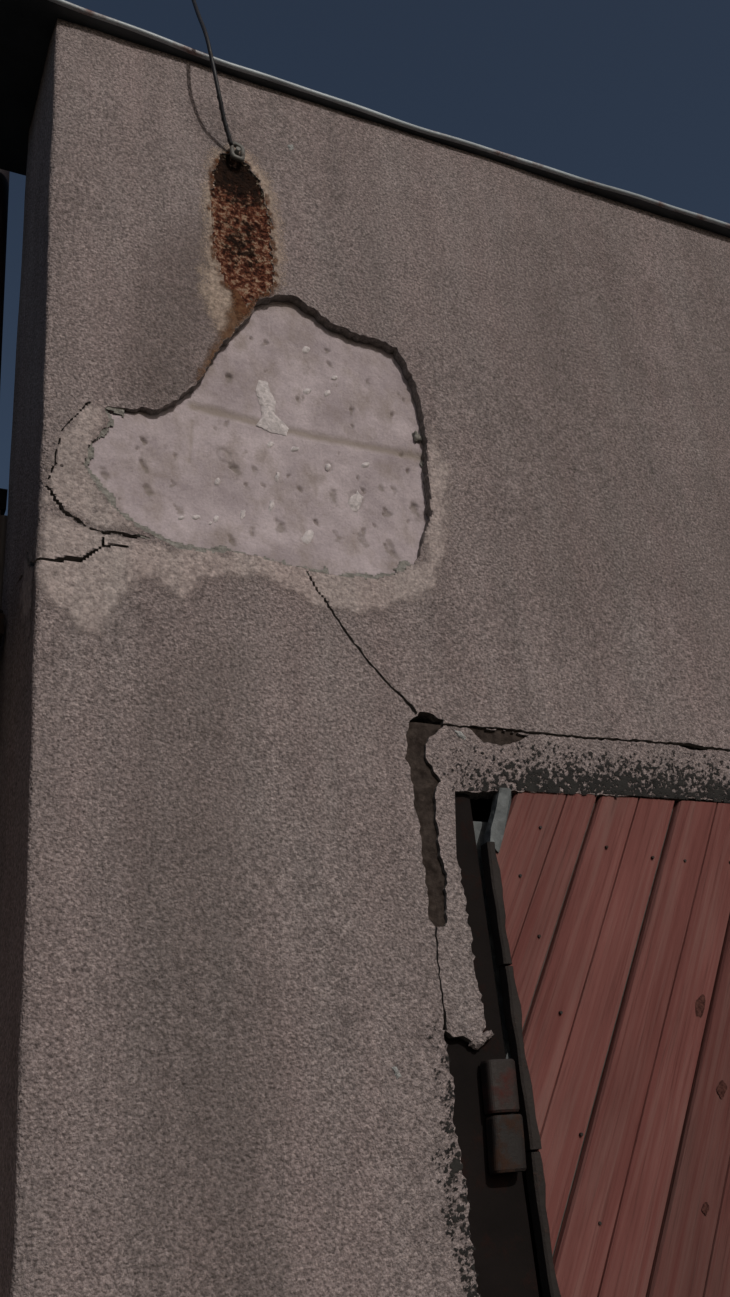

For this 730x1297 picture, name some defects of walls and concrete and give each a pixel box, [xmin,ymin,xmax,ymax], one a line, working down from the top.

rust [197,147,283,380]
flaking render [34,302,453,634]
flaking render [405,720,730,928]
crack [665,743,709,751]